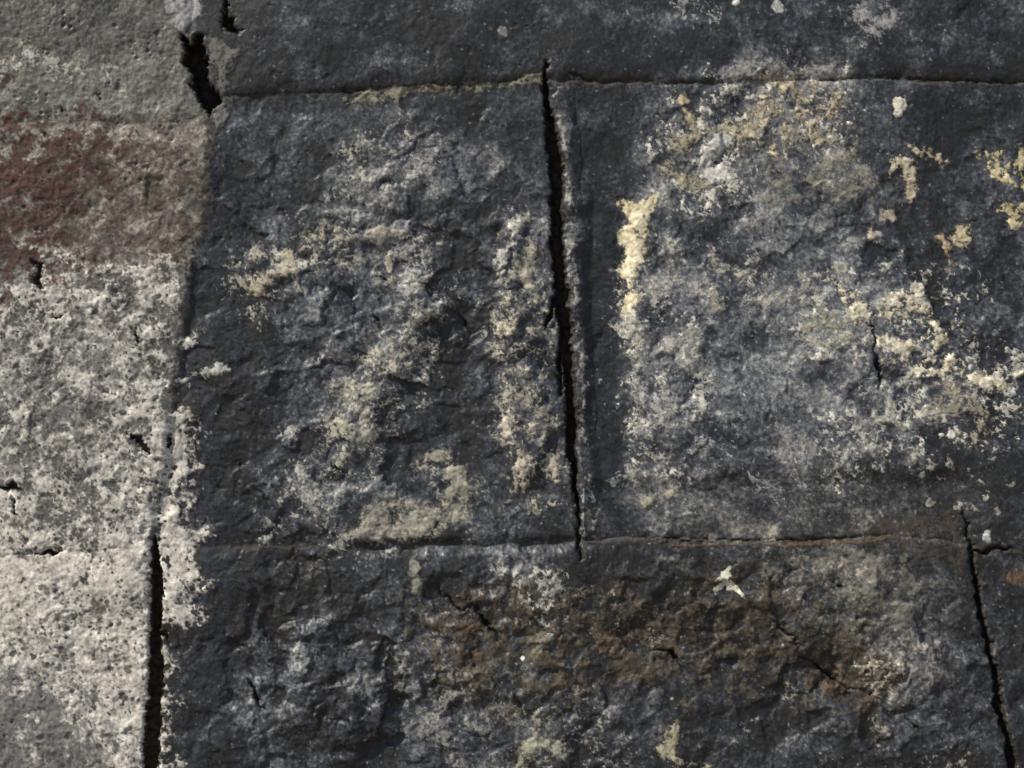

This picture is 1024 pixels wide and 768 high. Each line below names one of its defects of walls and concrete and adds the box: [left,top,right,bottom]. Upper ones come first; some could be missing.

crack [540,60,593,561]
crack [142,535,170,768]
crack [961,511,1017,768]